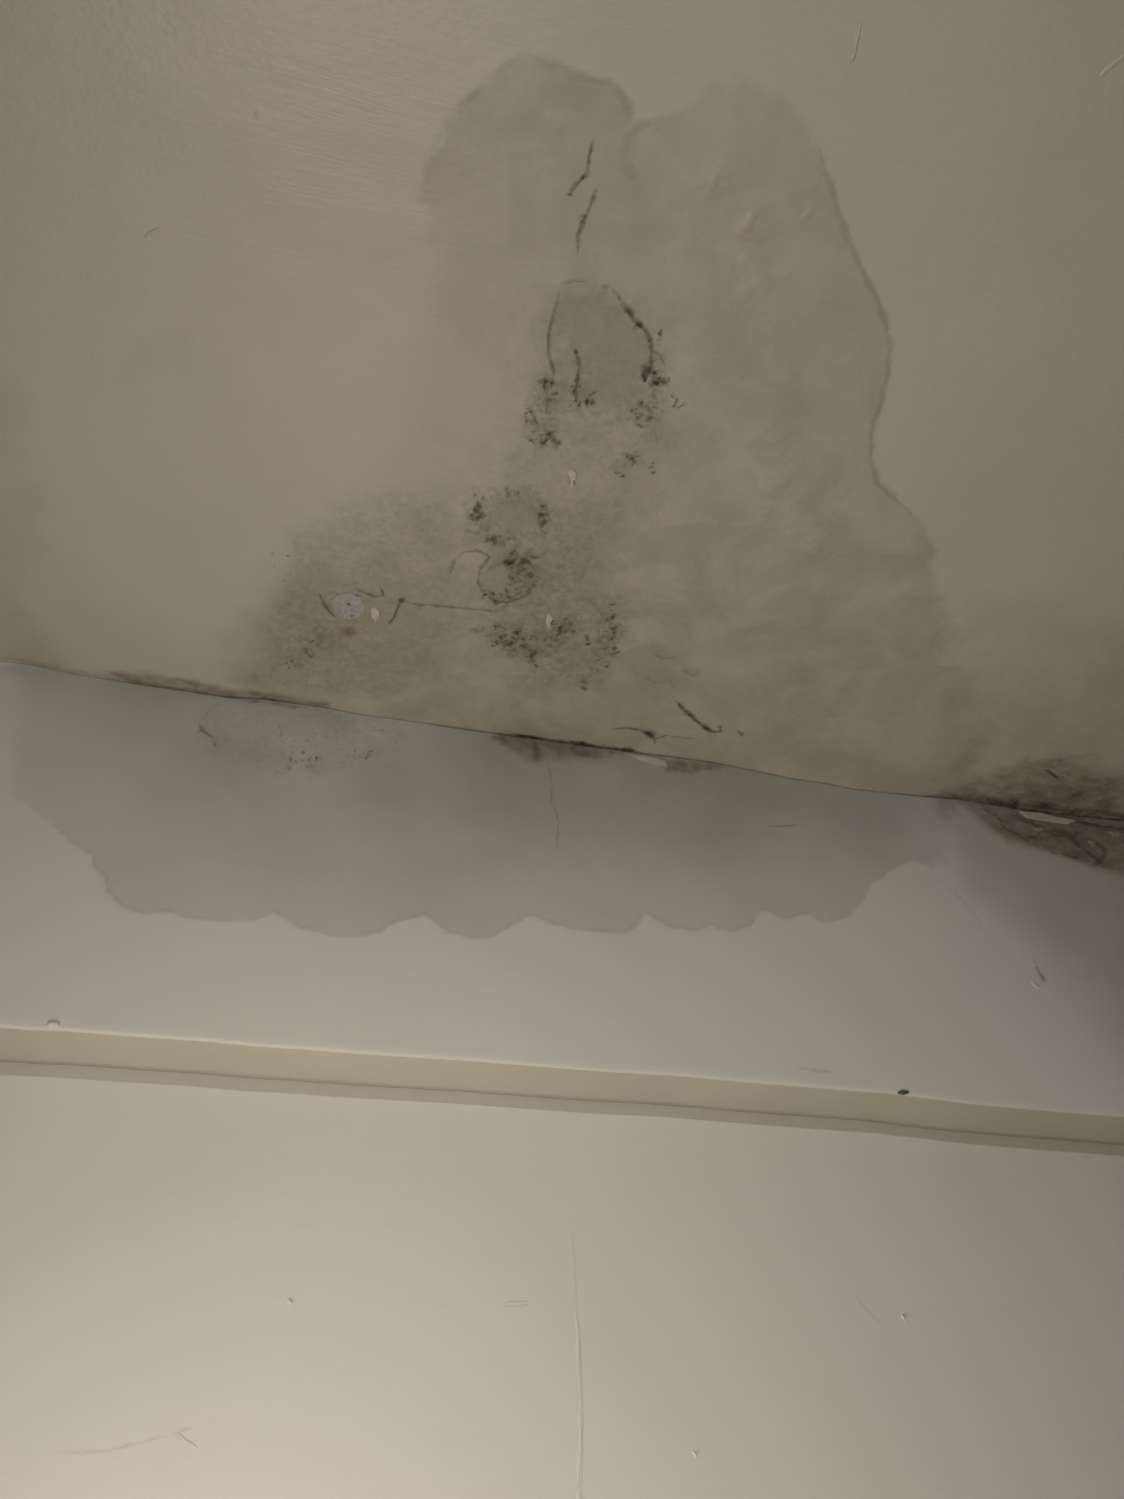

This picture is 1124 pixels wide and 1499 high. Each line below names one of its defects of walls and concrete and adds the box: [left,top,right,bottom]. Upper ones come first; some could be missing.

damp [504,734,632,752]